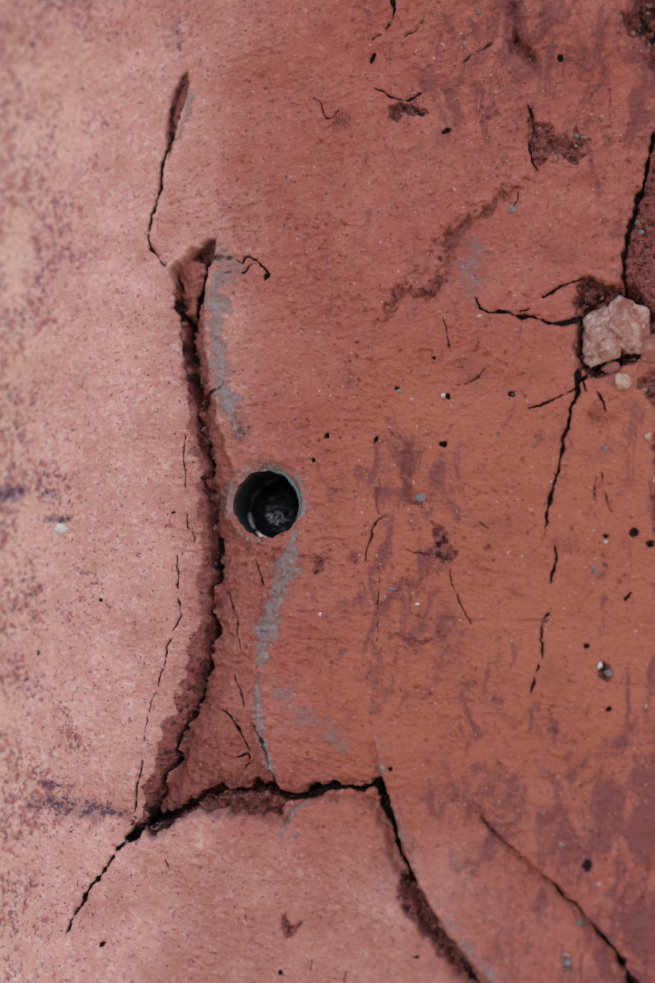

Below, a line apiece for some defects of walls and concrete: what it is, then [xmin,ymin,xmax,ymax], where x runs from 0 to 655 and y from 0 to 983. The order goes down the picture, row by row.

crack [170,74,188,118]
crack [375,89,421,102]
crack [527,105,538,171]
crack [620,132,655,299]
crack [476,277,583,327]
crack [528,369,606,584]
crack [67,144,414,932]
crack [408,550,471,624]
crack [530,613,550,693]
crack [544,876,642,983]
crack [465,962,479,982]